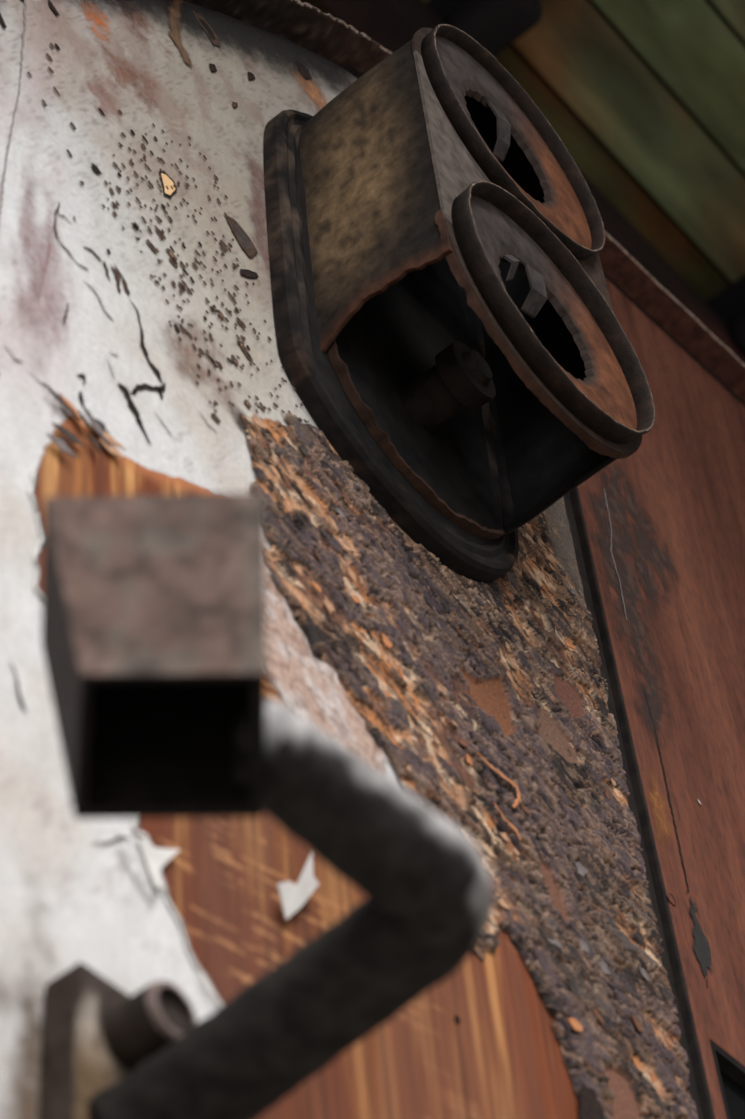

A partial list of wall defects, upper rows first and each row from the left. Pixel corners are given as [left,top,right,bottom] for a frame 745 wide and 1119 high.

crack [0,0,27,219]
crack [54,201,173,445]
spalling [91,123,309,423]
peeling [28,385,215,601]
peeling [604,489,627,620]
peeling [265,563,387,773]
rust [477,752,521,840]
peeling [132,811,368,1008]
peeling [258,924,580,1119]
peeling [686,890,713,977]